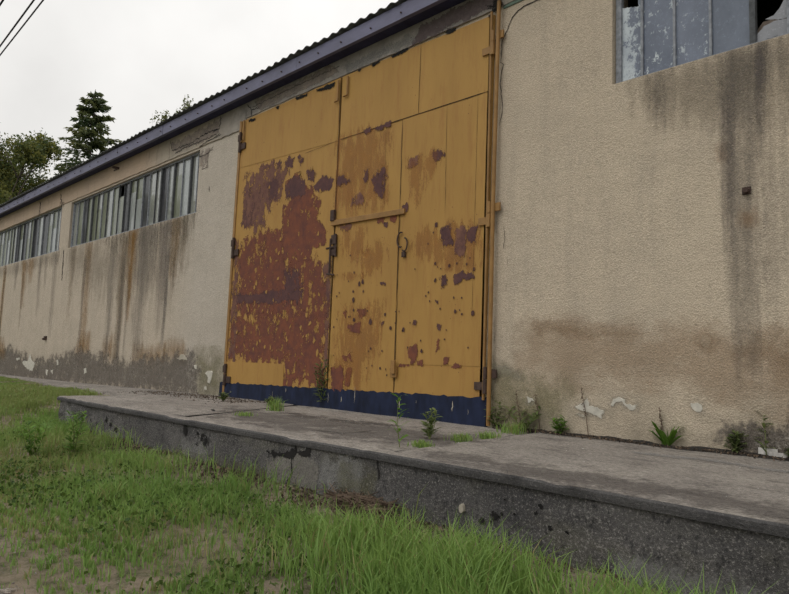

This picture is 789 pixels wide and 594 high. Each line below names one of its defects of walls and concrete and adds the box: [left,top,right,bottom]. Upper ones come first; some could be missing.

crack [499,0,537,125]
rust [363,167,389,198]
rust [377,202,408,228]
rust [228,154,353,392]
rust [433,222,478,288]
rust [343,272,396,333]
flaking render [0,344,213,392]
rust [398,339,423,367]
rust [435,324,461,369]
flaking render [575,397,636,419]
flaking render [719,422,789,457]
spalling [266,446,319,490]